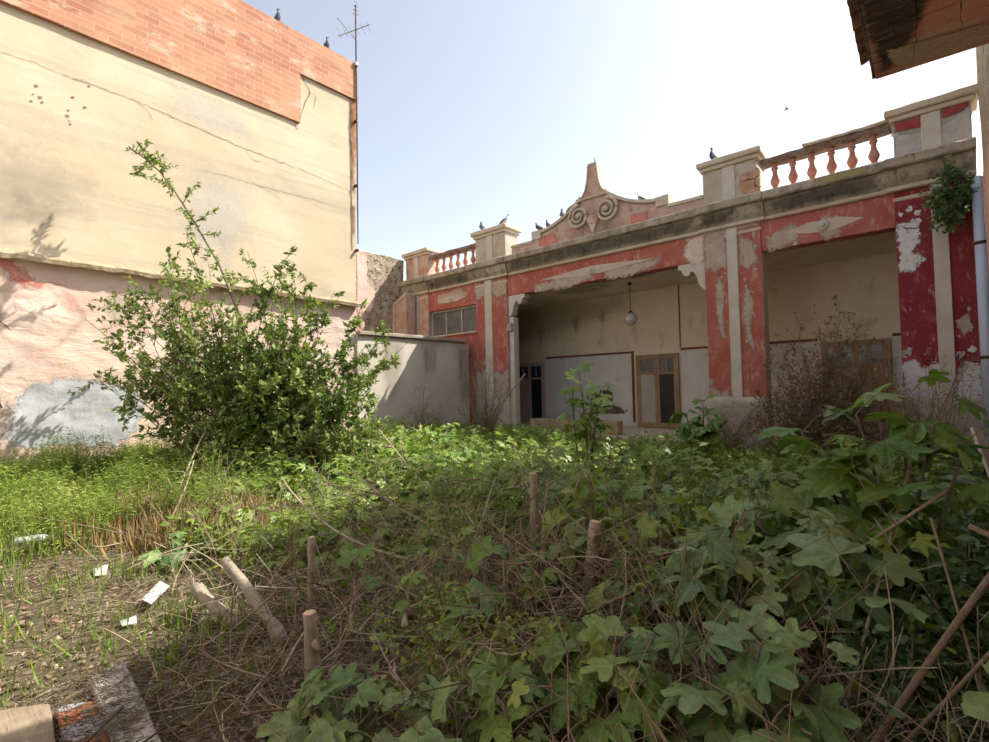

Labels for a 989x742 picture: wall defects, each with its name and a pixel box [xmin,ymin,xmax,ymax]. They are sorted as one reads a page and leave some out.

damp [856,0,929,72]
spalling [886,24,989,67]
crack [0,51,351,210]
peeling [893,116,921,138]
peeling [942,102,969,118]
spalling [735,167,765,195]
peeling [895,205,927,273]
peeling [534,257,662,292]
peeling [683,221,799,353]
peeling [899,347,941,397]
peeling [955,306,982,396]